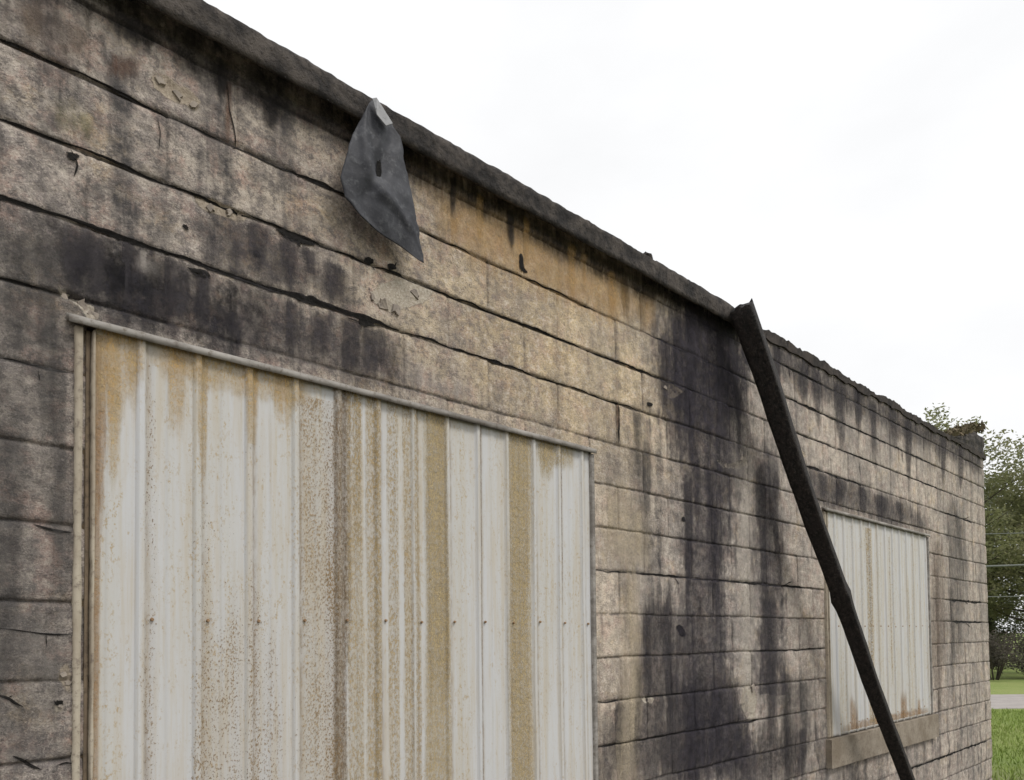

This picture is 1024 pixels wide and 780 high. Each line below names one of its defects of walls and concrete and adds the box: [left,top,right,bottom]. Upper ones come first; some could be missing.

crack [0,39,344,195]
damp [99,0,357,141]
damp [50,224,393,381]
rust [95,330,150,524]
rust [163,345,451,780]
rust [508,432,570,780]
damp [402,144,806,780]
damp [811,474,923,526]
rust [866,529,874,663]
damp [773,344,980,480]